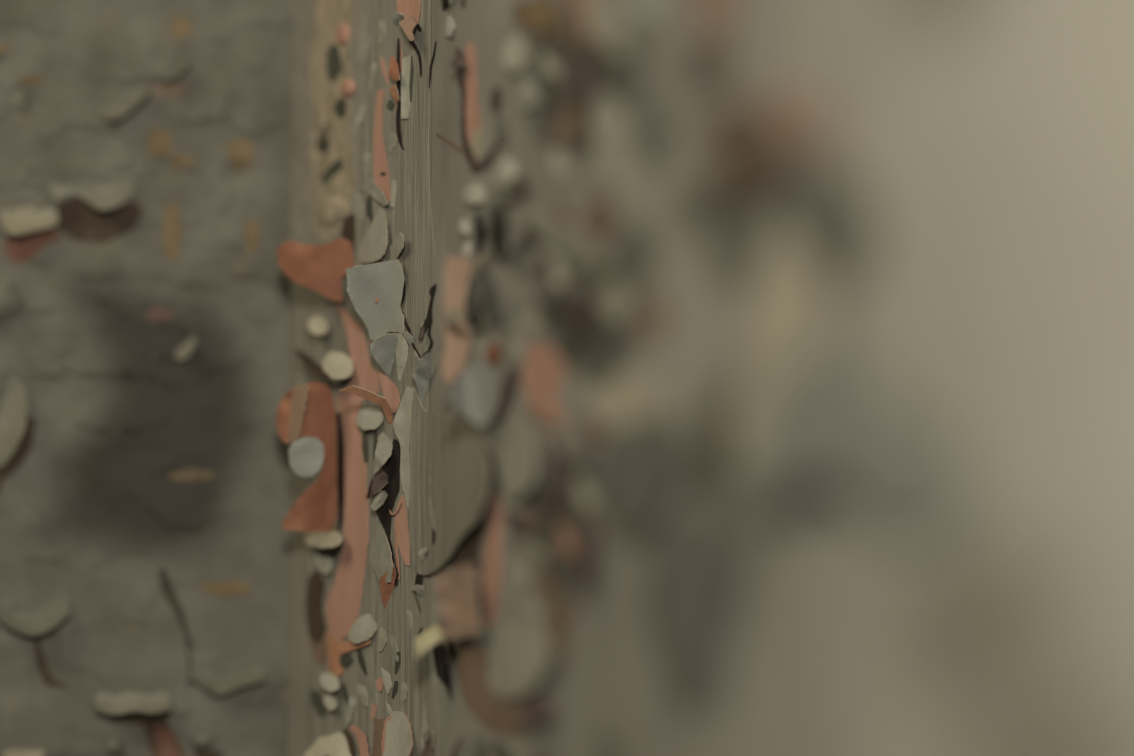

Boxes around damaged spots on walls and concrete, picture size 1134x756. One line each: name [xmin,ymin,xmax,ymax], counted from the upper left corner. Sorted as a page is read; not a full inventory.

peeling [501,0,676,192]
peeling [0,179,143,264]
peeling [0,376,36,488]
peeling [175,332,197,361]
peeling [276,0,567,756]
spalling [588,373,662,430]
peeling [703,100,977,534]
peeling [0,597,70,688]
peeling [96,692,171,752]
peeling [191,665,264,696]